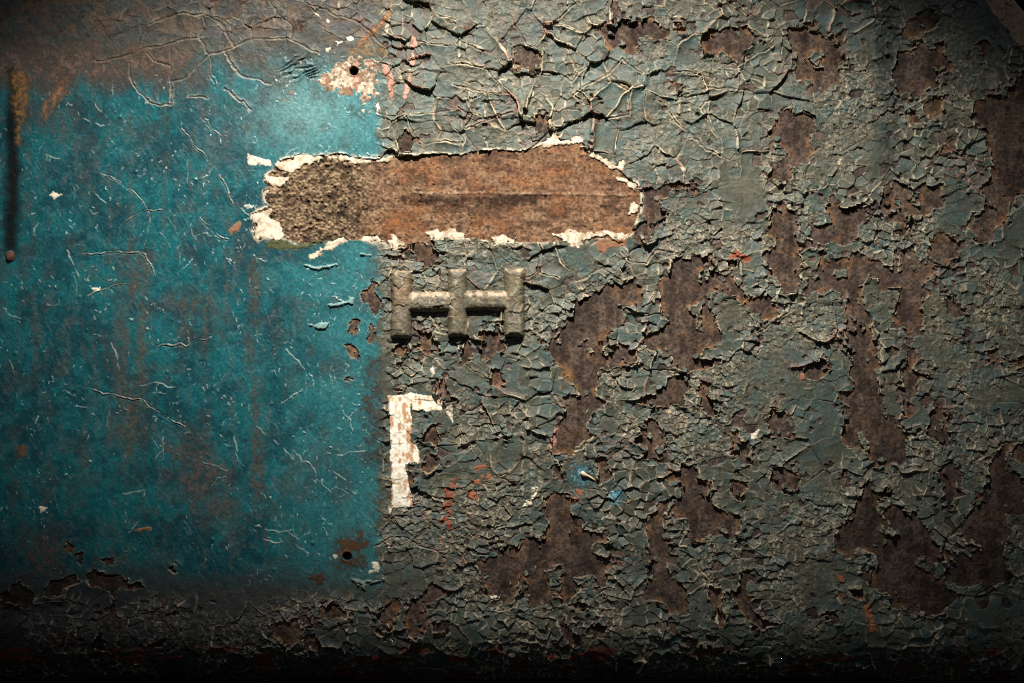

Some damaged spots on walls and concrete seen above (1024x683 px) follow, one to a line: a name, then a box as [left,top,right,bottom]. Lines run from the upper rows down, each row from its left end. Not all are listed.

rust [12,71,28,144]
crack [0,0,297,64]
peeling [317,37,418,115]
crack [308,4,449,77]
crack [412,12,510,56]
crack [571,56,645,122]
peeling [598,0,757,70]
crack [656,98,724,159]
rust [252,131,641,260]
peeling [328,279,460,424]
peeling [478,70,1024,648]
rust [336,532,369,566]